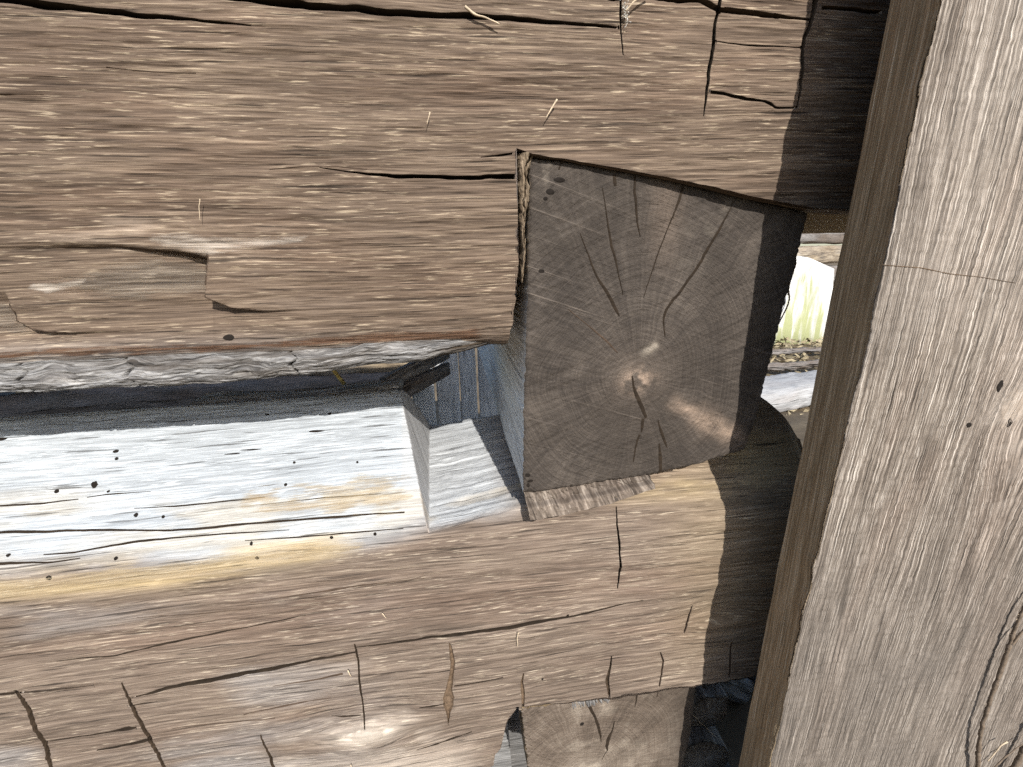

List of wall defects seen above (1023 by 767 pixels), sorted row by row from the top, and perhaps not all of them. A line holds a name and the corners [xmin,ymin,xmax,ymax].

crack [0,0,882,118]
crack [195,204,300,212]
crack [269,149,515,184]
crack [580,174,684,316]
crack [663,200,752,336]
crack [631,376,667,473]
crack [48,505,644,759]